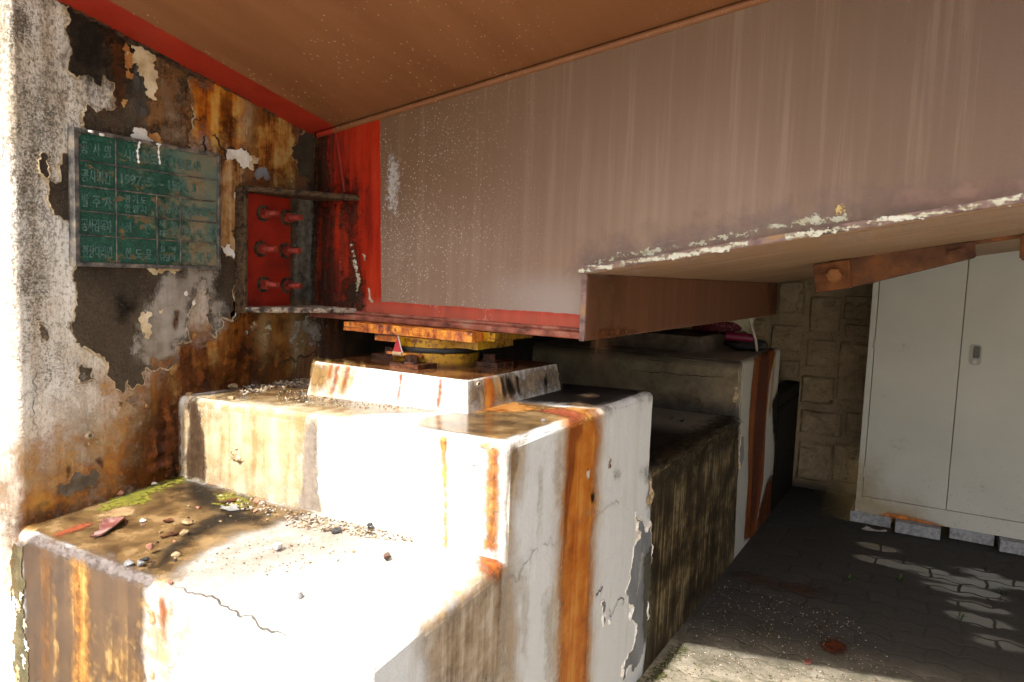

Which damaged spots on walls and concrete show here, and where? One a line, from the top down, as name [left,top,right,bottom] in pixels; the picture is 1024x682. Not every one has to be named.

peeling [36,151,69,223]
peeling [62,6,196,149]
peeling [68,227,239,420]
corrosion [188,72,296,259]
peeling [226,148,270,182]
peeling [578,193,1022,273]
corrosion [72,562,88,682]
crack [167,585,287,682]
corrosion [423,436,523,682]
corrosion [468,365,600,682]
peeling [620,476,654,681]
corrosion [744,349,776,539]